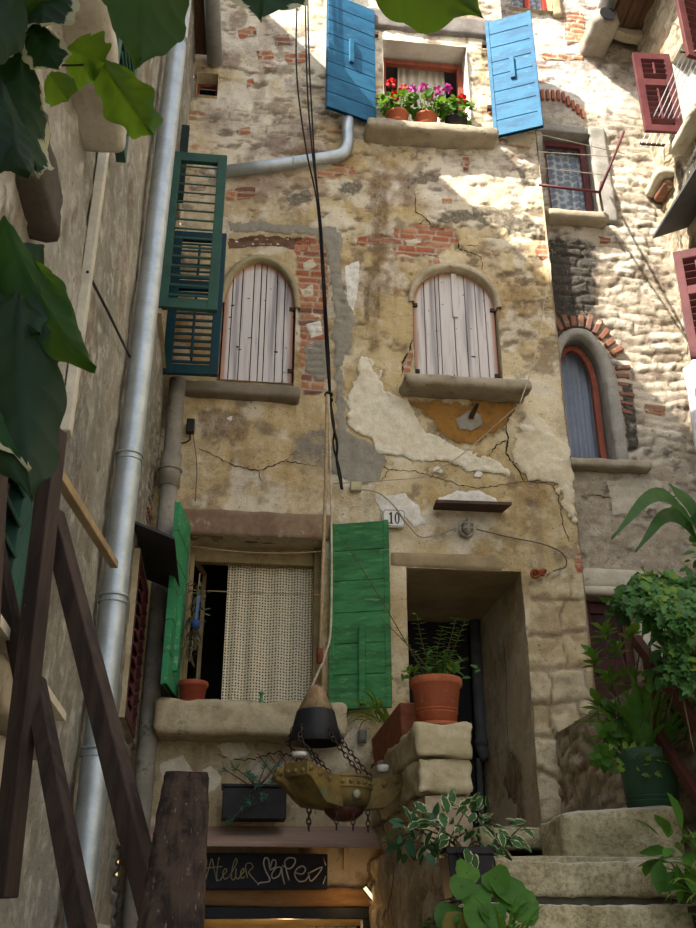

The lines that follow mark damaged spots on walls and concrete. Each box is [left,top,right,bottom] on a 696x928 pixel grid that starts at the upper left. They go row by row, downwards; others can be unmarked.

spalling [357,198,550,266]
spalling [228,235,328,396]
crack [199,448,316,481]
peeling [346,356,510,479]
peeling [438,490,497,502]
crack [381,405,570,542]